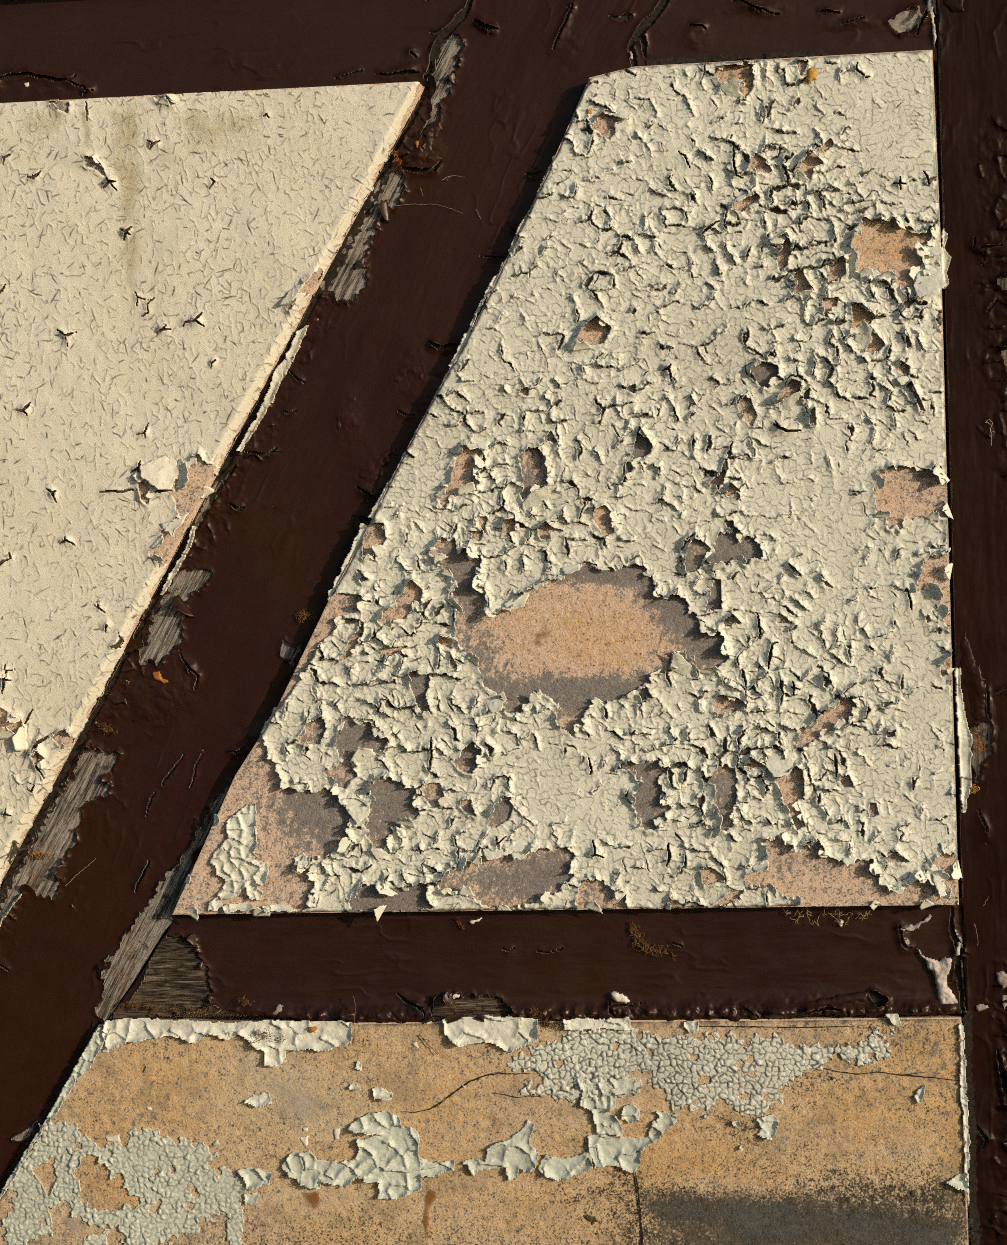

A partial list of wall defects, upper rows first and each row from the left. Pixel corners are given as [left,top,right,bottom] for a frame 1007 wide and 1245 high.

peeling [768,212,951,356]
peeling [132,325,309,666]
crack [0,0,498,910]
peeling [871,461,953,529]
peeling [911,548,953,626]
peeling [0,420,901,1245]
peeling [700,693,962,910]
crack [400,1072,540,1113]
peeling [946,1023,971,1206]
corrosion [423,1190,436,1232]
crack [633,1173,643,1245]
leakage [633,1190,971,1245]